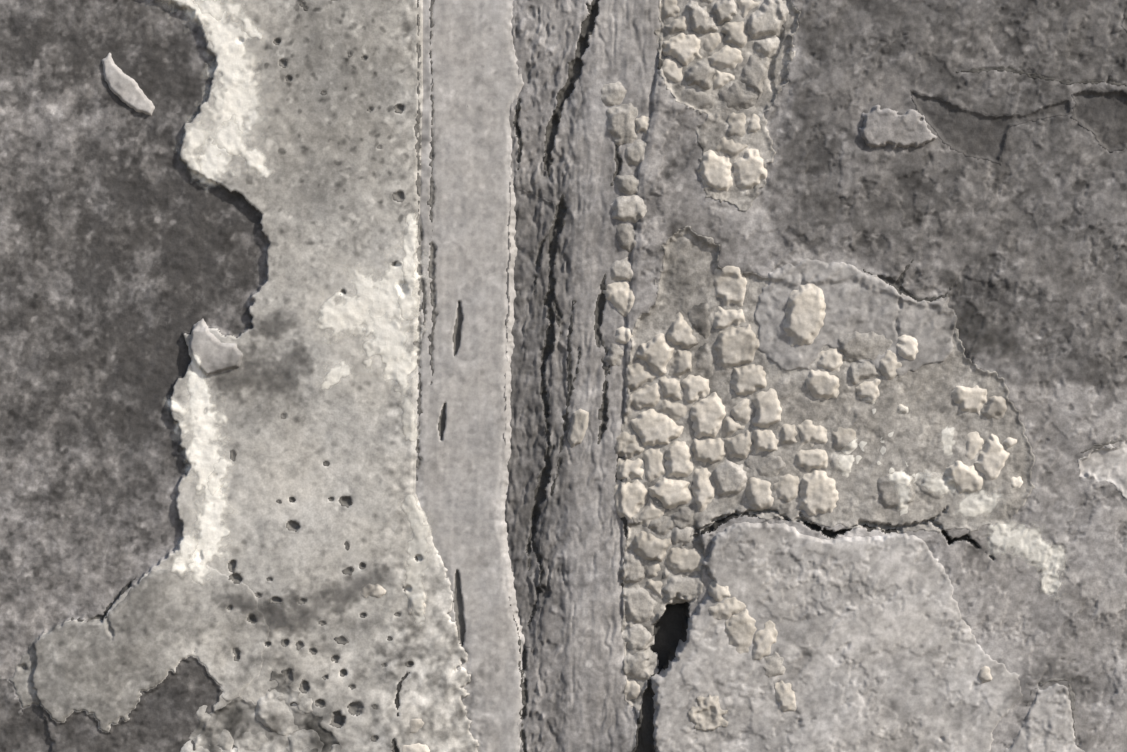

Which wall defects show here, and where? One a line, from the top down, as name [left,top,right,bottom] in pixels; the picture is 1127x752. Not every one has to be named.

spalling [0,0,378,752]
crack [413,0,439,481]
crack [510,0,622,752]
crack [620,516,628,587]
spalling [654,0,801,211]
crack [698,509,995,560]
spalling [614,226,1085,752]
flaking render [859,87,1127,165]